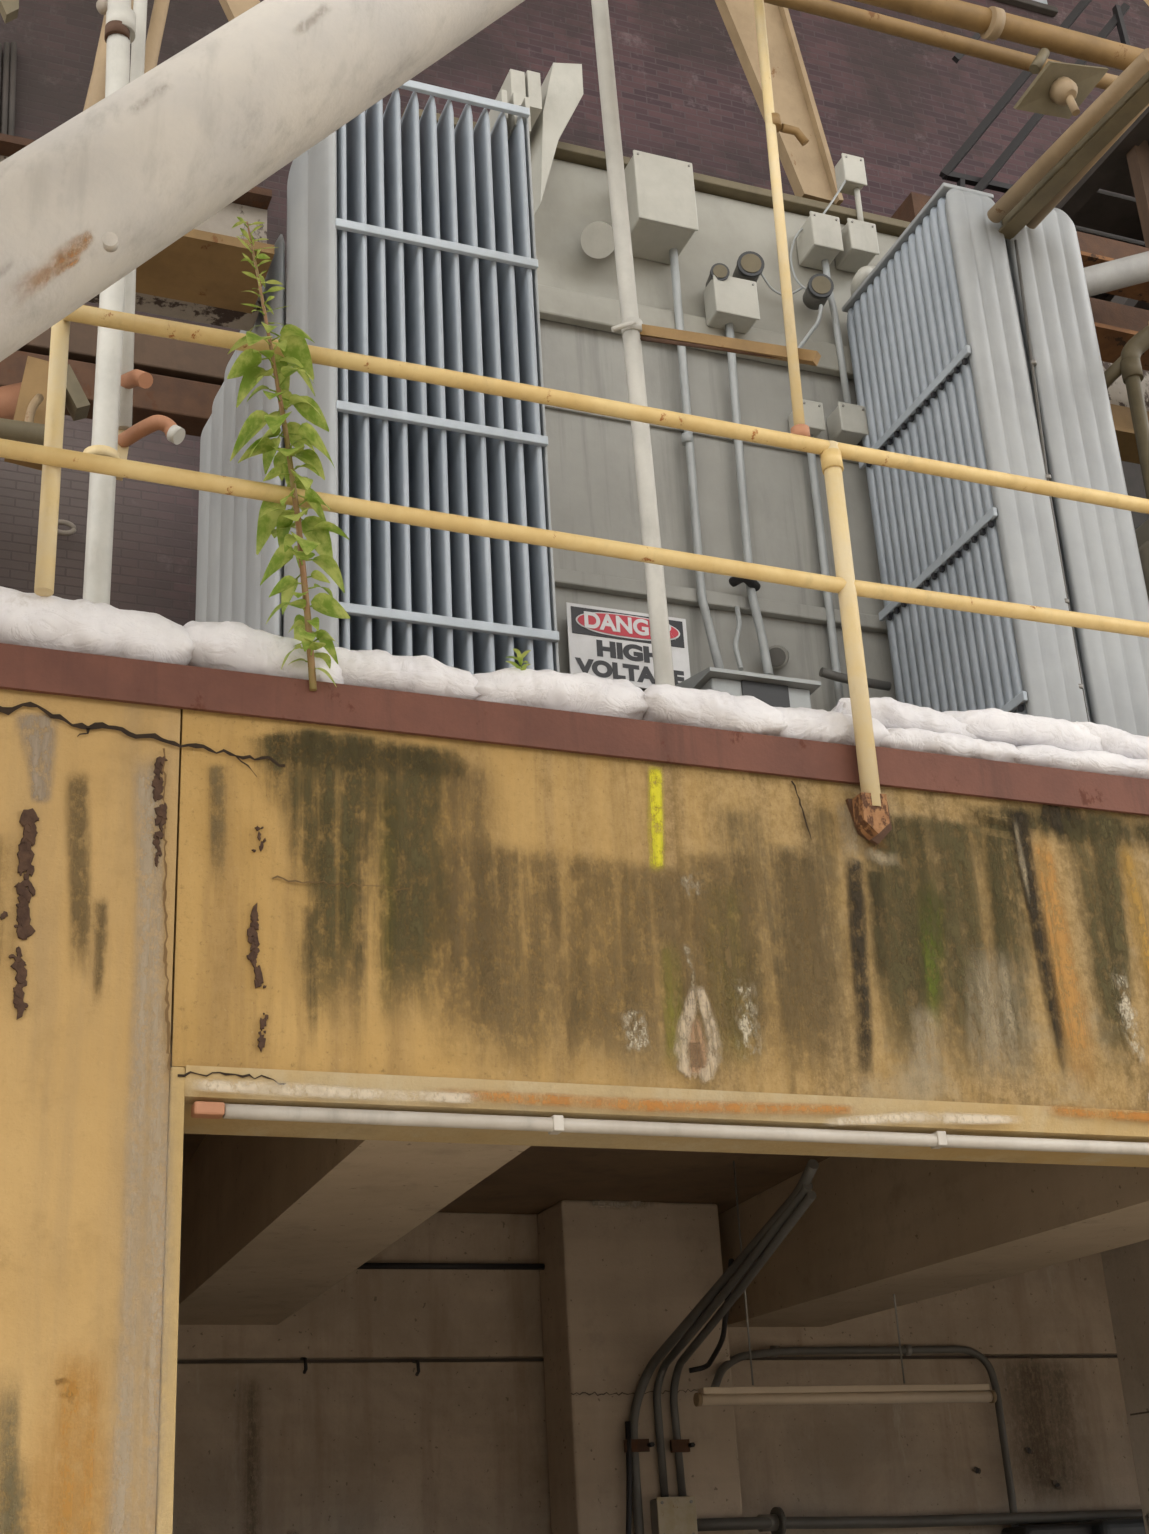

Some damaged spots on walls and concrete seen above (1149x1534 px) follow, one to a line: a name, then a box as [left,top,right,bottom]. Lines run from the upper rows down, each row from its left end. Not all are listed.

spalling [151,756,168,867]
damp [211,767,223,848]
spalling [0,715,53,1020]
crack [0,702,286,1085]
spalling [246,903,267,989]
damp [264,729,561,1038]
damp [571,818,761,1049]
damp [848,805,1149,1067]
spalling [257,1013,269,1052]
damp [199,1081,470,1102]
damp [832,1113,1012,1125]